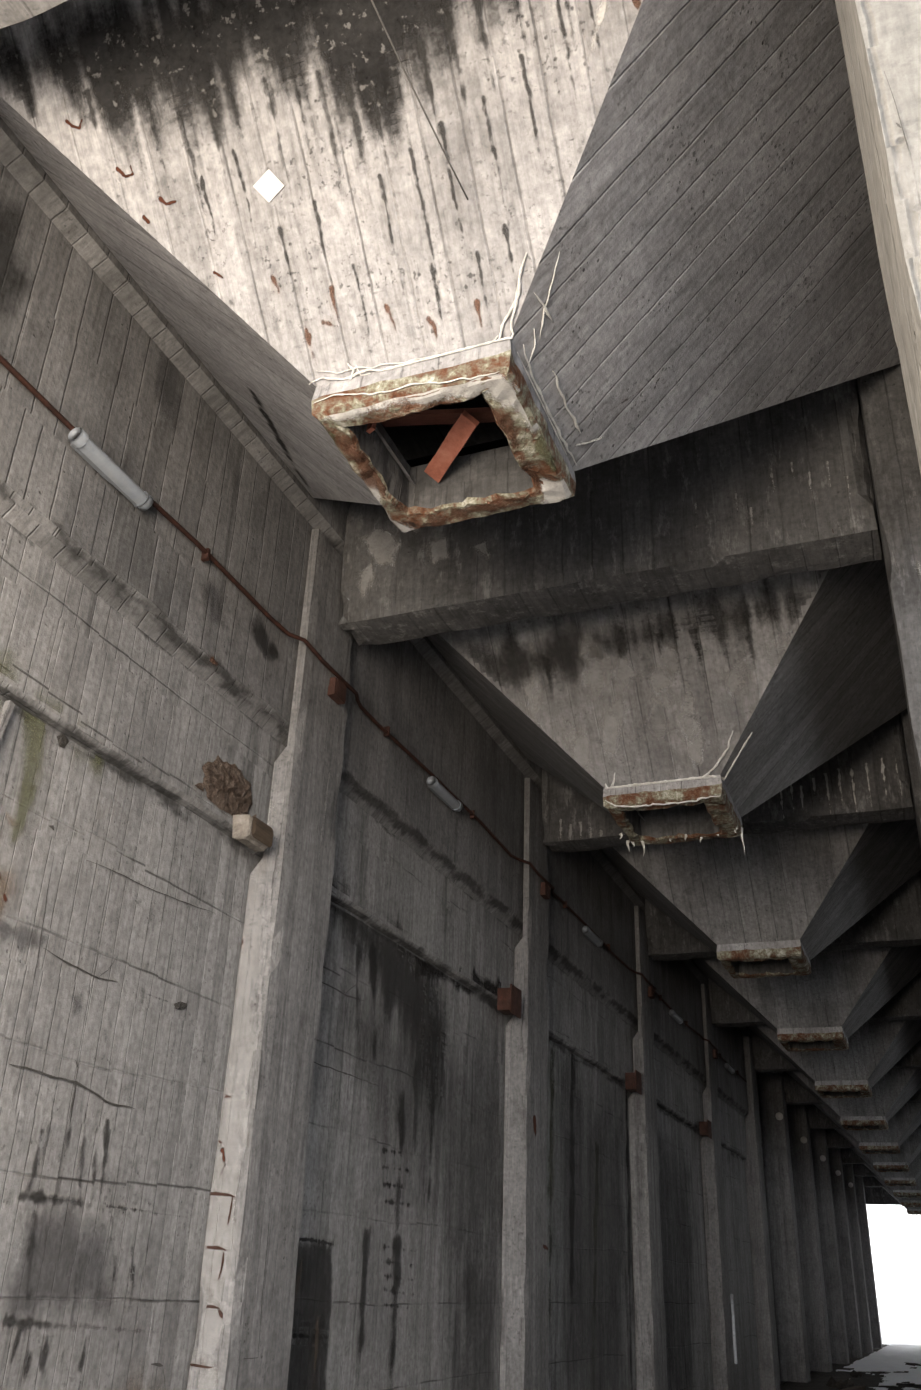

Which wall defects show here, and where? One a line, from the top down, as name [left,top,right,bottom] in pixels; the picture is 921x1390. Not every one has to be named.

water stain [0,0,519,232]
water stain [519,34,539,151]
water stain [557,0,569,58]
water stain [378,174,393,243]
water stain [409,148,442,317]
corrosion [340,434,402,508]
corrosion [424,398,538,527]
water stain [252,616,278,659]
water stain [472,578,804,808]
spalling [195,755,256,817]
water stain [316,772,501,1375]
water stain [20,1120,109,1266]